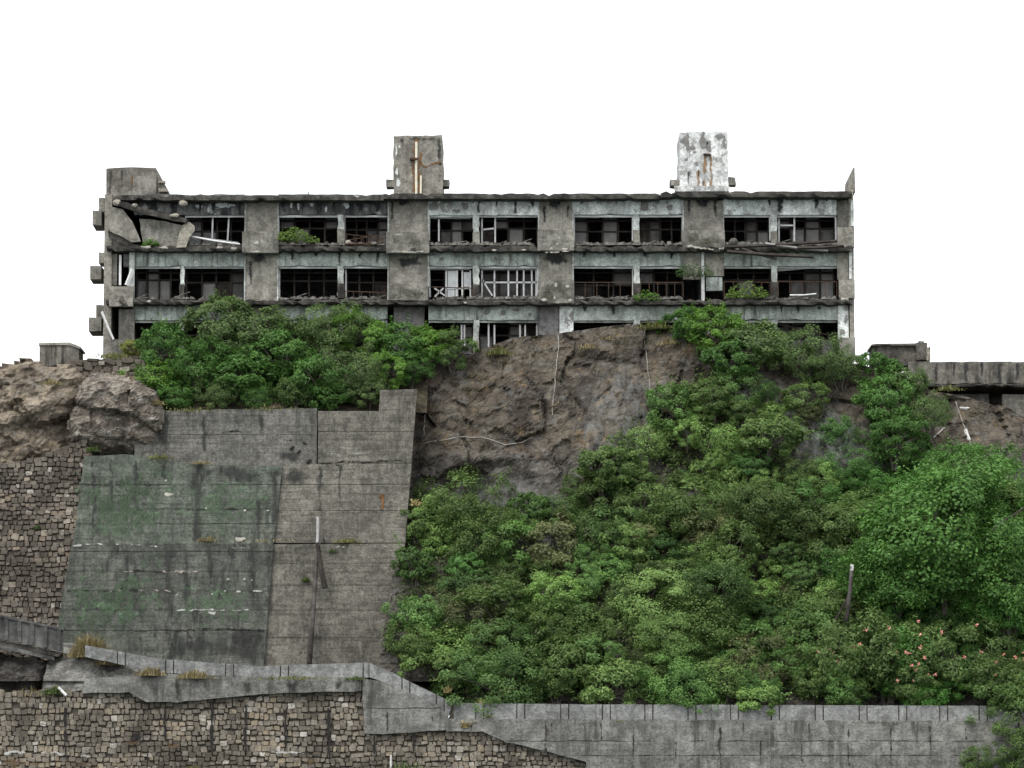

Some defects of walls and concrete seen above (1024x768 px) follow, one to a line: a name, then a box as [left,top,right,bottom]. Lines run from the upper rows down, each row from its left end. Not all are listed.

corrosion [412,139,440,192]
peeling [680,131,725,175]
corrosion [696,156,712,186]
leakage [192,465,257,538]
leakage [256,452,302,535]
leakage [154,545,249,616]
leakage [211,547,271,609]